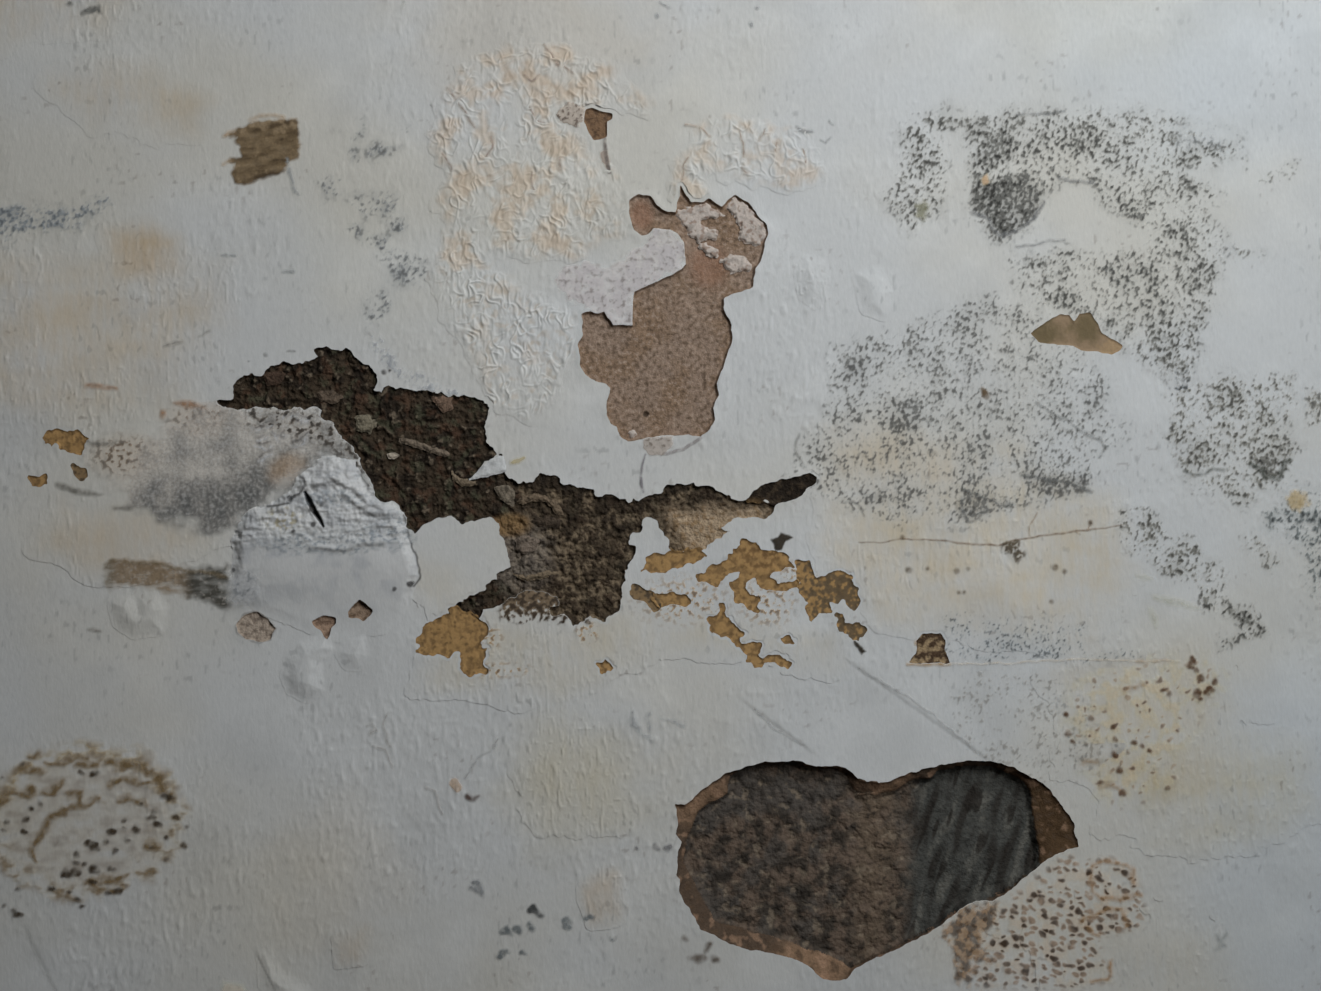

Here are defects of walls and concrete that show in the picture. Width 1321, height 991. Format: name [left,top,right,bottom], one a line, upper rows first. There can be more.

damp [0,199,365,608]
damp [412,549,478,620]
peeling [416,605,489,677]
peeling [387,438,564,515]
damp [404,599,866,849]
peeling [557,102,830,488]
peeling [629,538,867,669]
damp [772,301,1321,864]
peeling [1031,312,1123,355]
damp [884,110,1321,504]
flaking render [675,760,1079,981]
damp [985,889,1231,991]